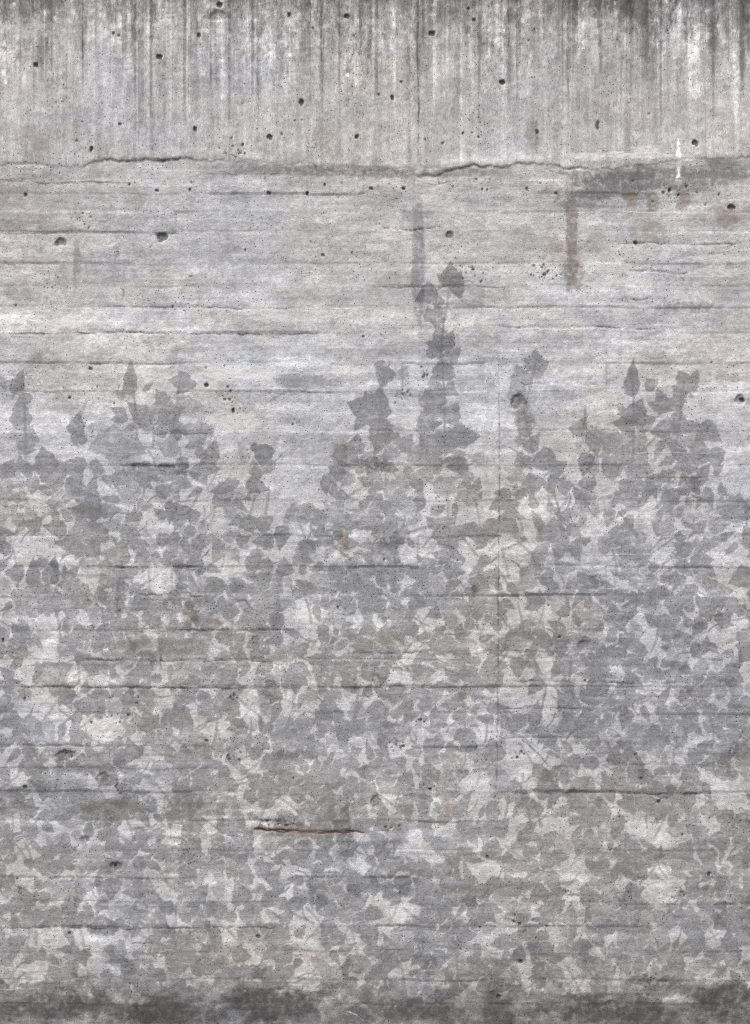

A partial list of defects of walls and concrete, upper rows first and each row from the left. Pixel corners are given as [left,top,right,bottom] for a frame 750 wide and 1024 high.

rust [565,199,578,280]